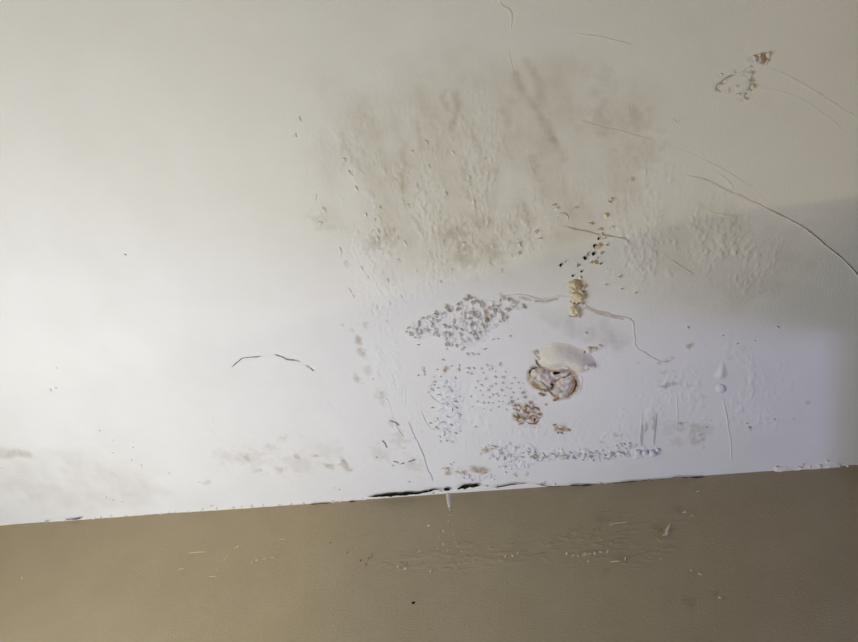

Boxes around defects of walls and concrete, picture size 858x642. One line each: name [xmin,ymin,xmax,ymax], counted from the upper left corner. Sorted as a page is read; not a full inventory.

peeling [714,52,770,101]
peeling [559,198,614,279]
crack [232,354,318,371]
peeling [405,292,673,445]
crack [0,441,707,526]
peeling [441,439,664,483]
crack [773,460,858,472]